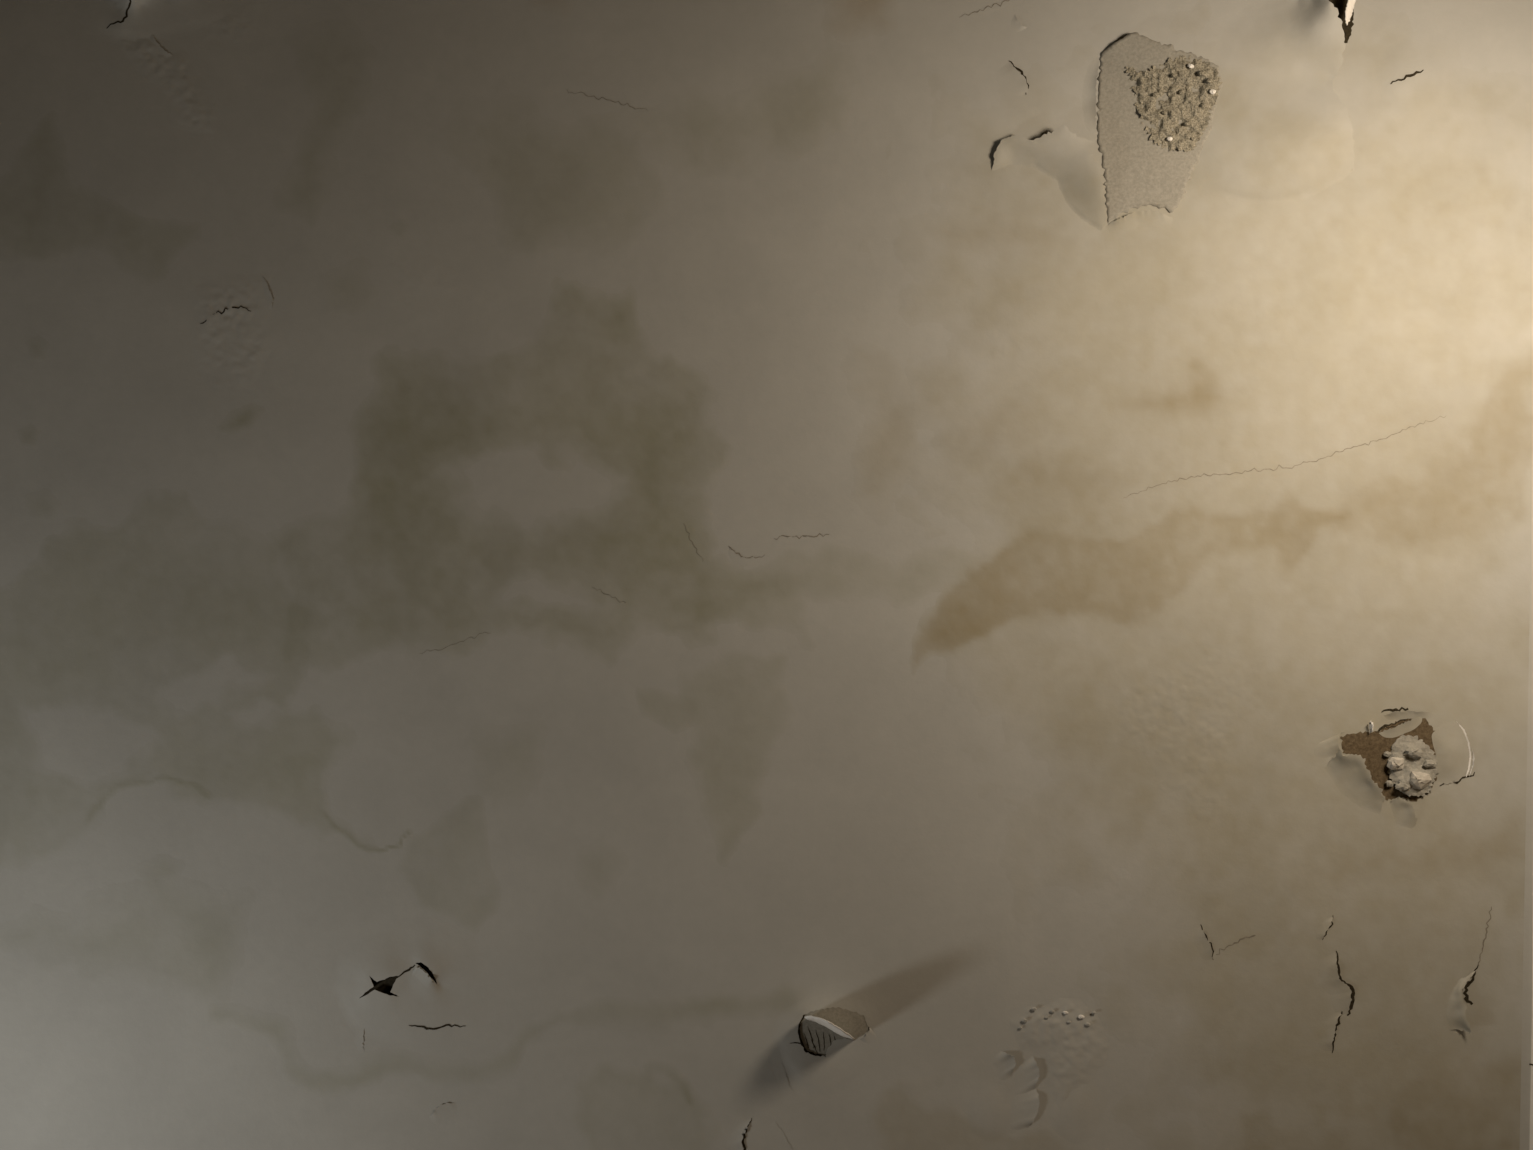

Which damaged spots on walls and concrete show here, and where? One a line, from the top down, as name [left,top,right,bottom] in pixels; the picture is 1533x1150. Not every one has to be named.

peeling [991,0,1356,233]
water stain [0,276,983,936]
water stain [840,0,1533,1150]
flaking render [1314,707,1475,829]
water stain [0,853,806,1097]
crack [1193,924,1255,961]
crack [1316,917,1355,1053]
peeling [1446,907,1492,1034]